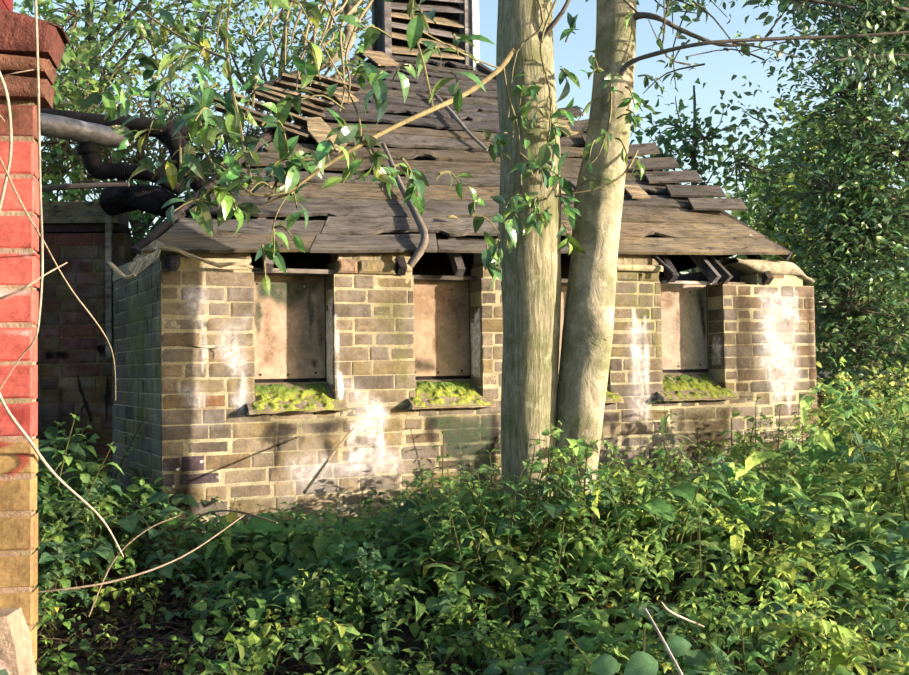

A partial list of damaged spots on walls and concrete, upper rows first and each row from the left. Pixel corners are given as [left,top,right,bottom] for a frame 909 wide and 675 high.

damp [223,346,244,405]
damp [632,346,648,383]
damp [737,296,753,395]
damp [765,294,798,406]
peeling [9,453,29,475]
damp [265,423,294,461]
damp [315,392,395,471]